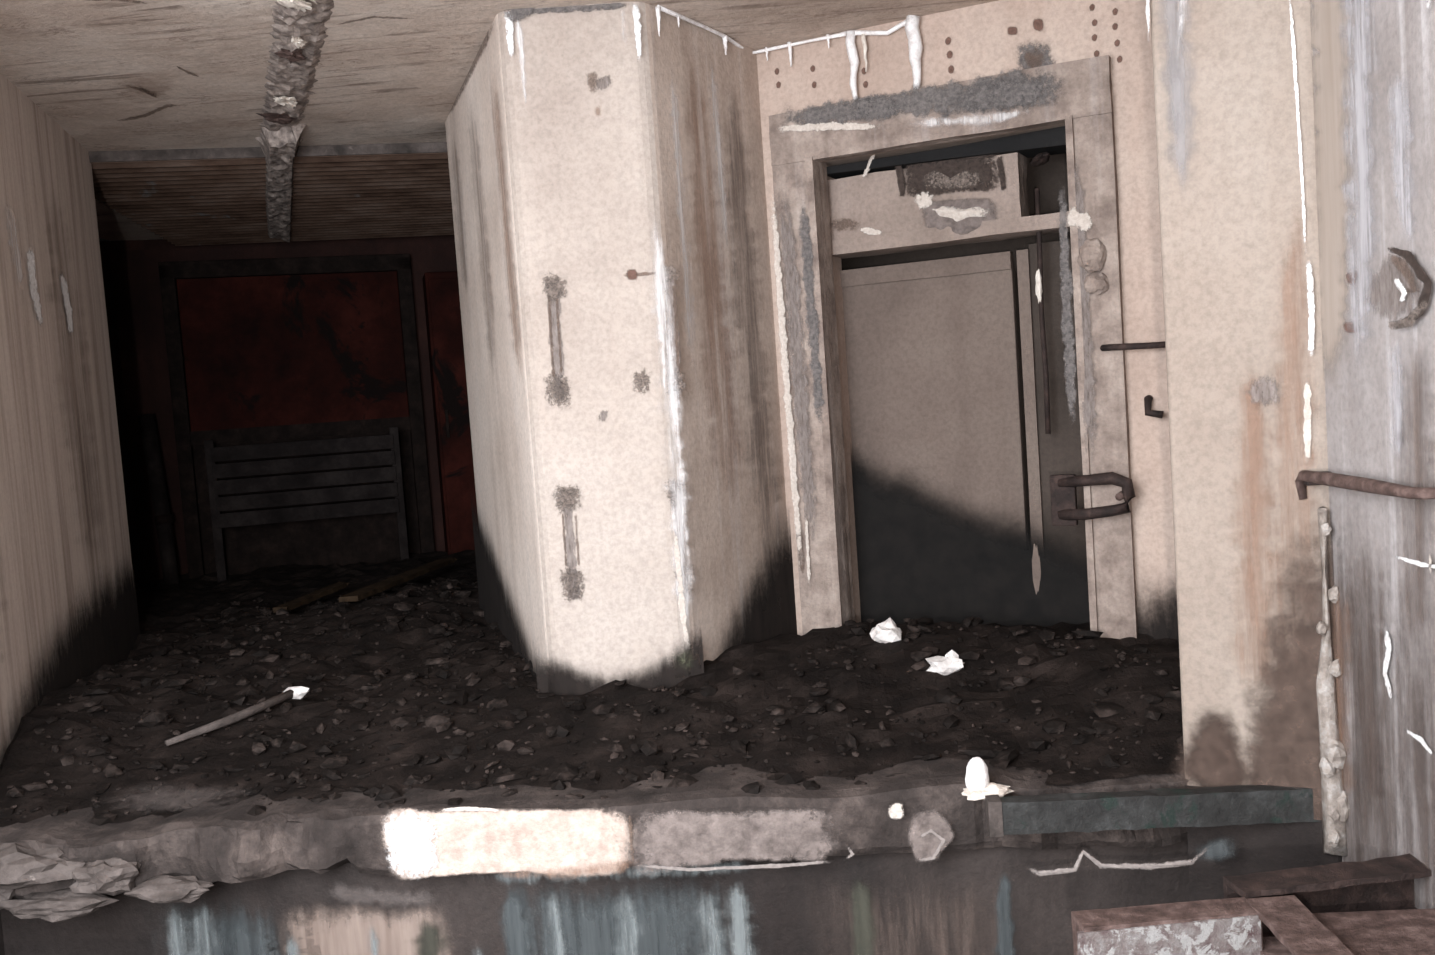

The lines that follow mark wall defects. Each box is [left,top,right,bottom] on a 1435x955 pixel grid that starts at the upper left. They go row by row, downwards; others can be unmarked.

crack [123,86,174,121]
peeling [273,96,298,109]
peeling [277,0,317,13]
peeling [291,36,307,48]
damp [780,19,1061,132]
damp [1392,354,1423,619]
corrosion [1246,388,1339,820]
damp [171,887,449,955]
spalling [0,803,1230,955]
damp [497,871,751,955]